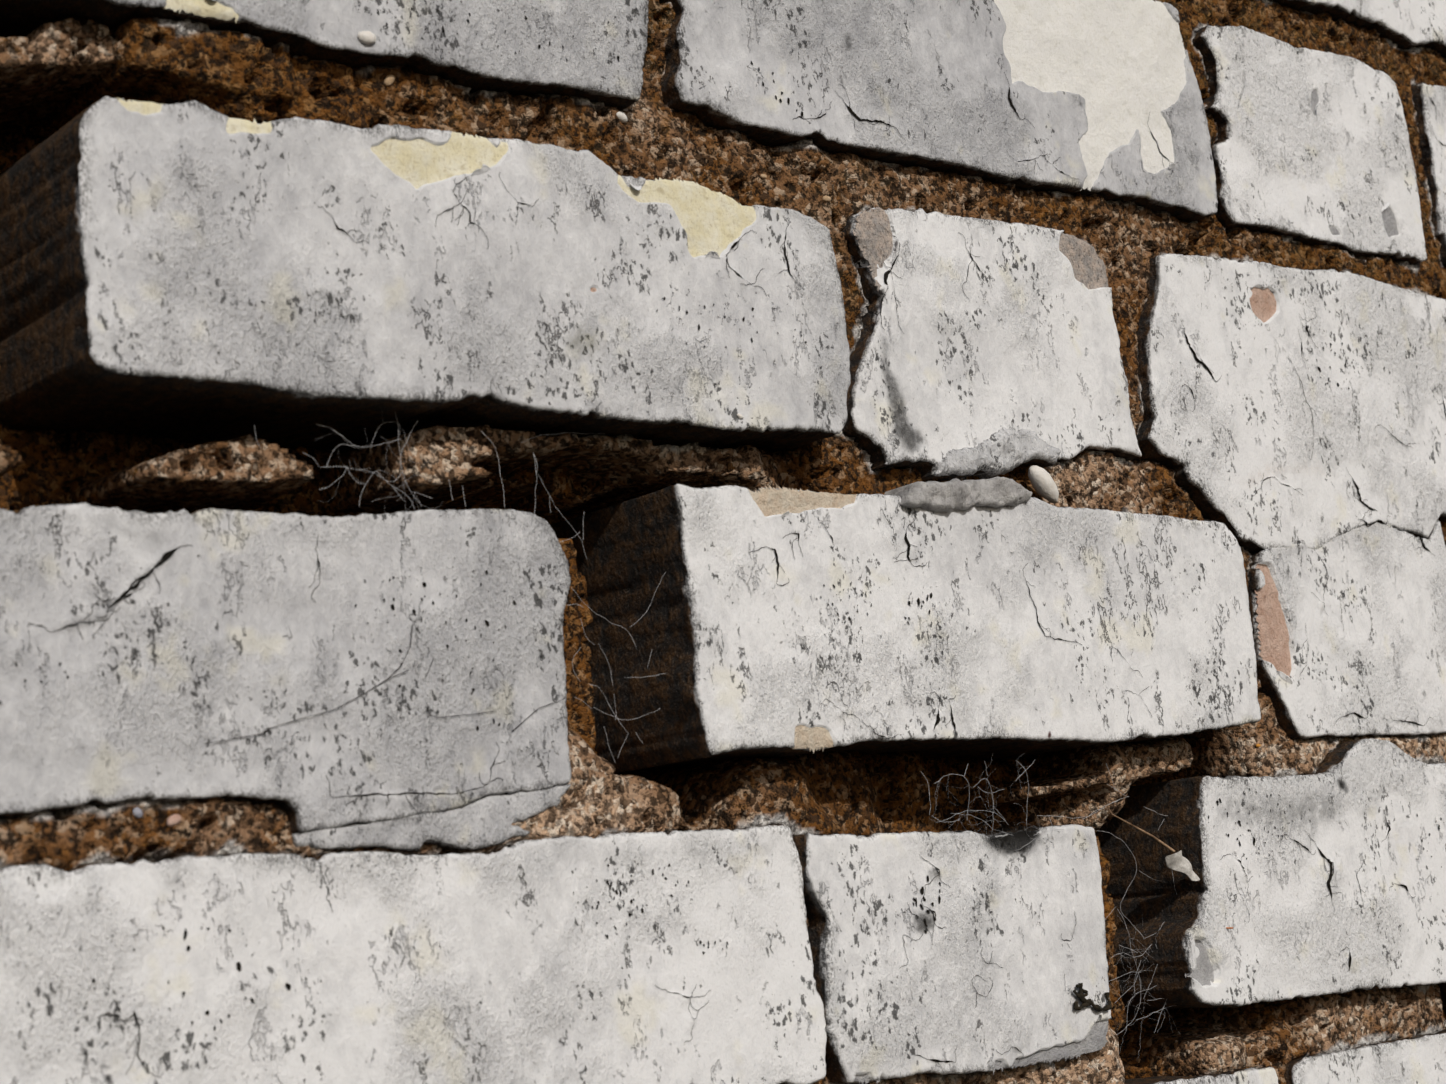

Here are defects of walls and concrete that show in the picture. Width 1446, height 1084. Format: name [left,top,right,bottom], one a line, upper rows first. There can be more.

peeling [994,0,1186,191]
peeling [370,132,508,189]
peeling [618,175,756,259]
spalling [853,206,898,290]
crack [1181,332,1218,412]
crack [1255,314,1319,495]
crack [1377,387,1446,447]
crack [1346,468,1436,556]
crack [29,545,193,638]
spalling [1255,564,1293,684]
crack [1282,811,1415,909]